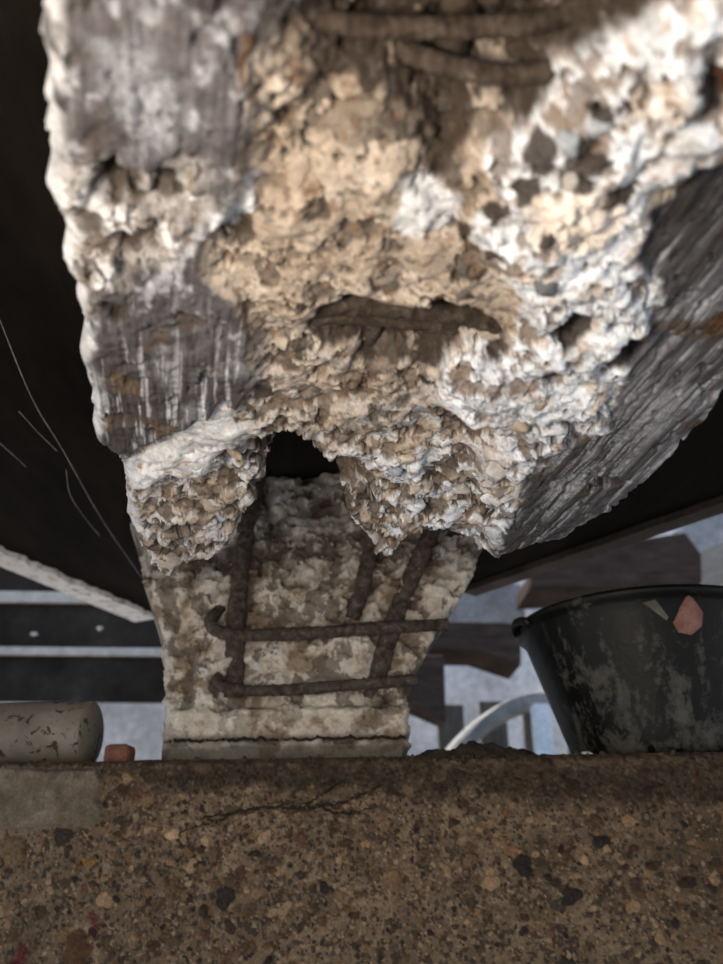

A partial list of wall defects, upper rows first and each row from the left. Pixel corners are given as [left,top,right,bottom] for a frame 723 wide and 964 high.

spalling [465,0,655,71]
spalling [40,0,75,178]
spalling [645,153,723,210]
leakage [437,0,723,553]
spalling [80,0,612,711]
spalling [639,382,723,483]
crack [179,780,381,833]